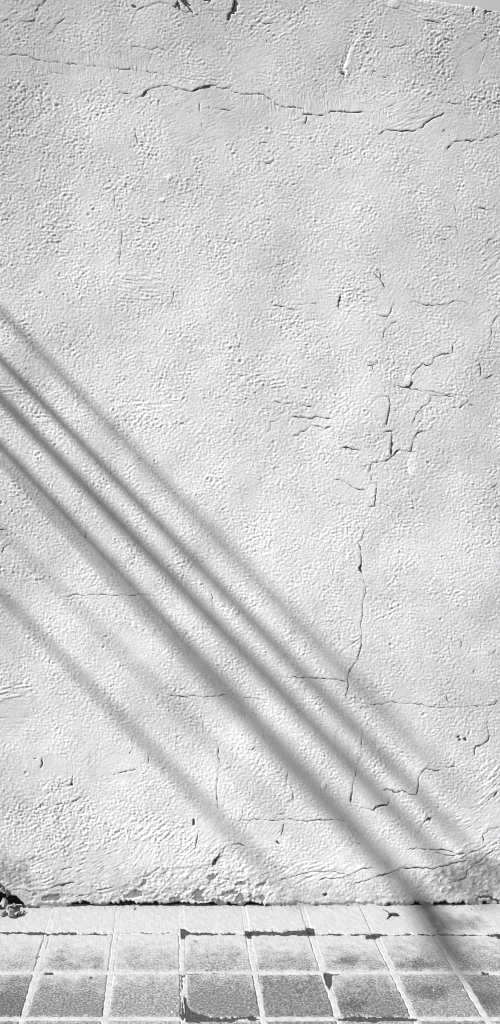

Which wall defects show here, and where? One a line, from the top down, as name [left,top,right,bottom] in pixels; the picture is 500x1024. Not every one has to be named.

crack [1,46,498,150]
crack [374,270,454,337]
crack [268,346,472,507]
crack [195,531,498,885]